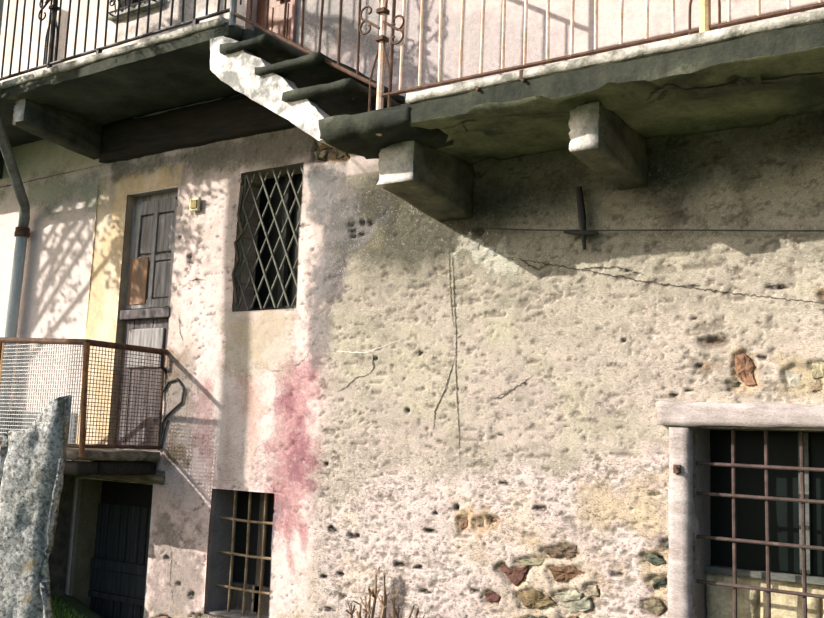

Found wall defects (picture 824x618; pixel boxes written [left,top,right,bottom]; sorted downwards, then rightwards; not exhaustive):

damp [752,111,824,155]
damp [632,143,730,200]
damp [307,164,615,367]
crack [495,255,824,304]
crack [337,355,375,392]
crack [433,230,461,459]
spalling [730,345,760,393]
spalling [776,353,824,396]
peeling [149,514,201,618]
spalling [484,539,600,618]